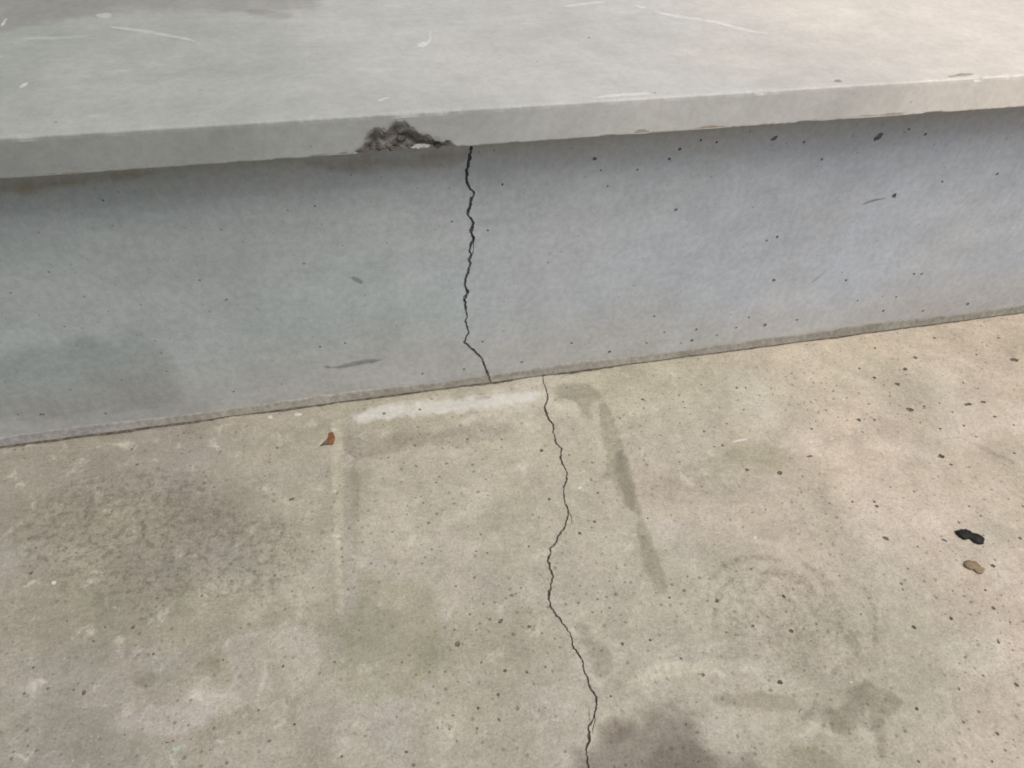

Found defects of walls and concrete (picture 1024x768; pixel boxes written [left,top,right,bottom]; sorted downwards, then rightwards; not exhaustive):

spalling [347,117,458,155]
crack [463,146,491,382]
crack [542,376,598,768]